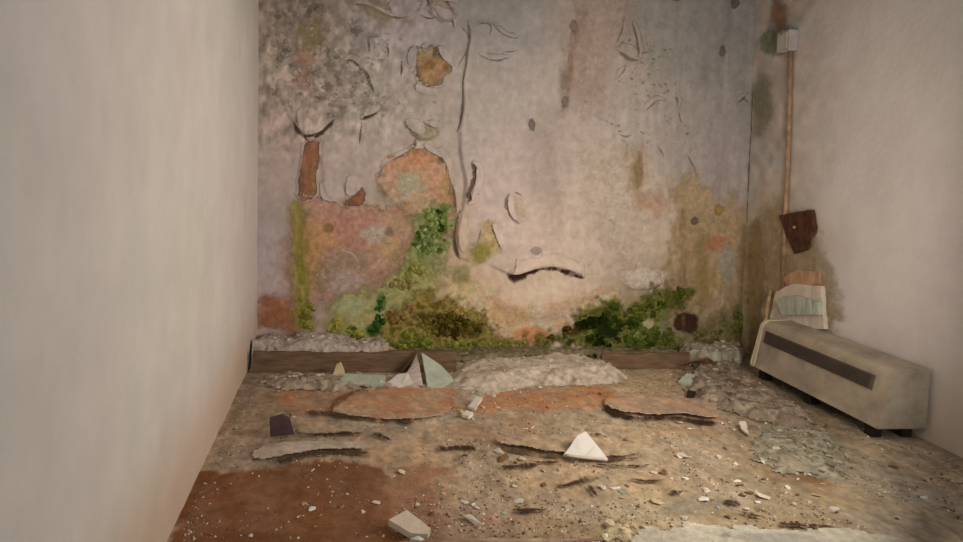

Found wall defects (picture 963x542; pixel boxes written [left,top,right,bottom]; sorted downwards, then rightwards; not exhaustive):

crack [294,117,334,142]
spalling [266,0,505,308]
crack [343,0,586,282]